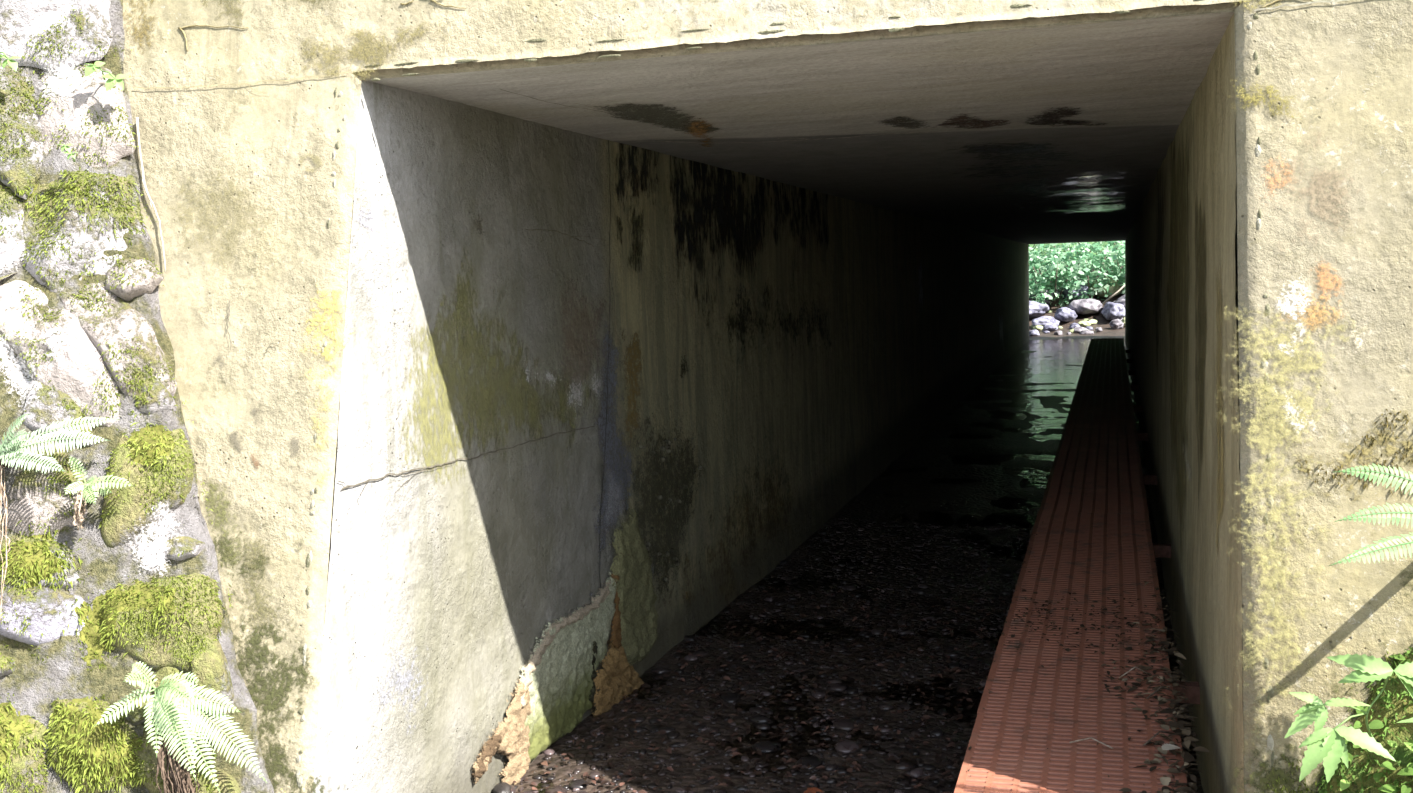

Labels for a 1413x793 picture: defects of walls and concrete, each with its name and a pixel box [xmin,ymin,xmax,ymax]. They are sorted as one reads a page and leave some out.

spalling [331,116,345,188]
crack [338,89,623,587]
leakage [615,143,829,303]
rust [1287,263,1342,330]
peeling [471,572,617,785]